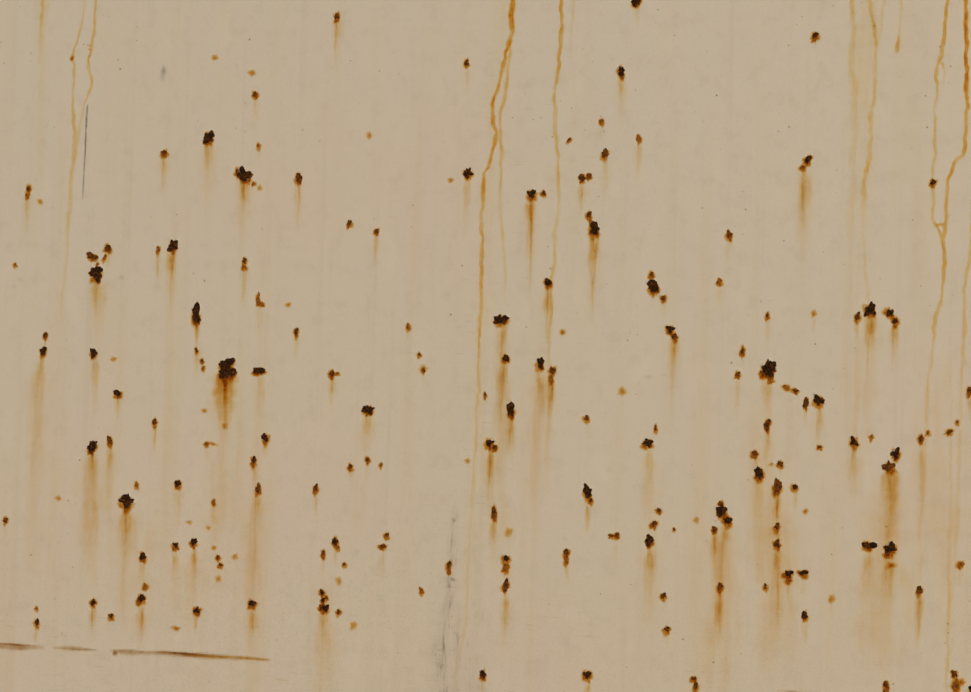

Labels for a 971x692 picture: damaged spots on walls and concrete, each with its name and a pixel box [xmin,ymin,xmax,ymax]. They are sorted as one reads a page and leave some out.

corrosion [235,165,255,186]
corrosion [586,211,600,237]
corrosion [86,245,112,284]
corrosion [645,272,666,303]
corrosion [191,301,202,326]
corrosion [854,301,899,328]
corrosion [218,356,238,391]
corrosion [759,356,825,410]
corrosion [881,447,900,474]
corrosion [118,482,138,513]
corrosion [711,501,733,534]
corrosion [861,541,897,566]